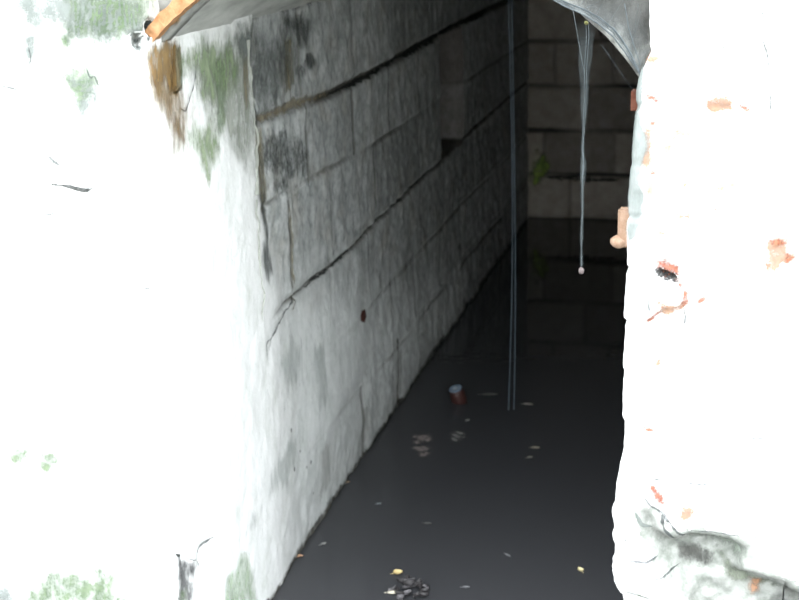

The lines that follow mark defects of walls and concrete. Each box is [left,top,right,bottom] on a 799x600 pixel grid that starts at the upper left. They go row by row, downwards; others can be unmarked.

corrosion [145,0,200,147]
leakage [193,62,226,184]
leakage [239,6,326,279]
peeling [706,95,754,112]
crack [266,167,434,357]
spalling [647,251,707,325]
peeling [765,238,795,272]